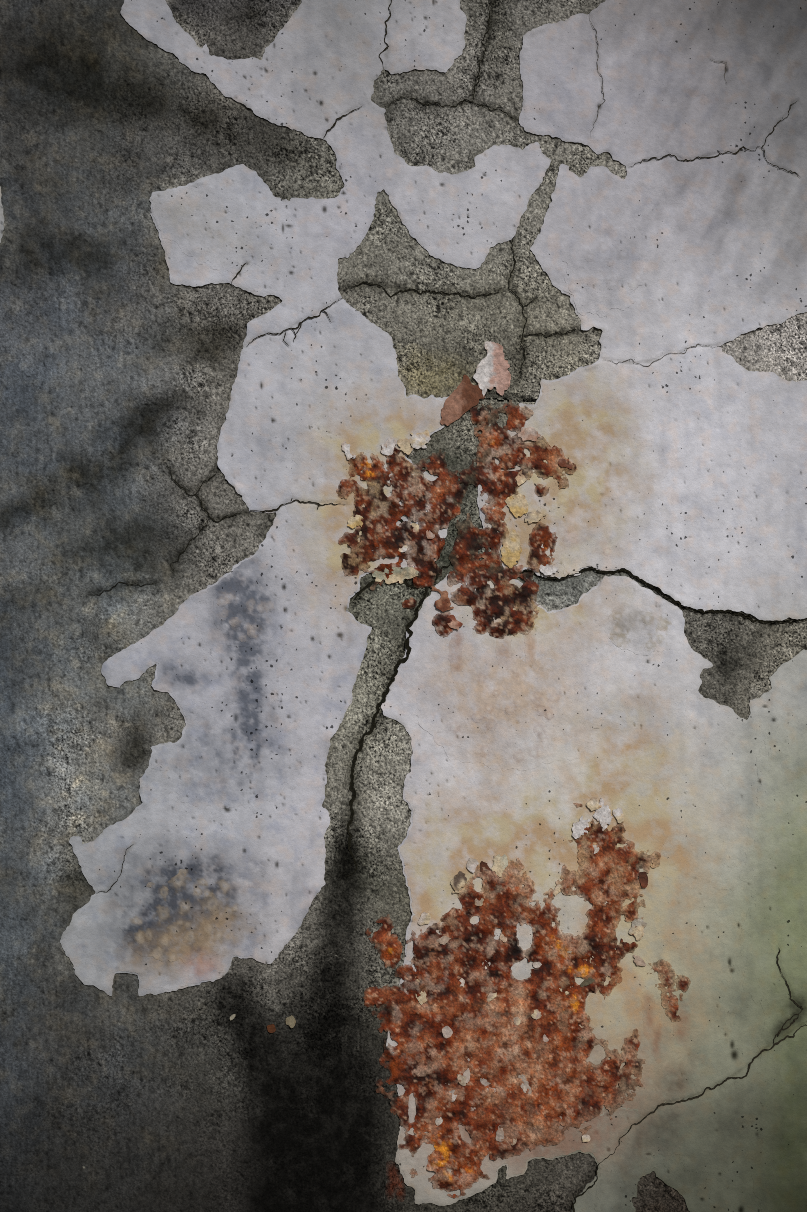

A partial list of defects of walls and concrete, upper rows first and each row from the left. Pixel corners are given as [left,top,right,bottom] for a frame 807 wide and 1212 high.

crack [323,0,515,138]
crack [246,239,580,378]
peeling [337,0,627,454]
peeling [0,359,276,1212]
peeling [322,573,442,862]
crack [347,552,451,876]
rust [284,341,671,672]
spalling [516,569,807,720]
crack [522,567,807,624]
peeling [397,1152,597,1212]
rust [362,669,756,1202]
crack [572,947,807,1212]